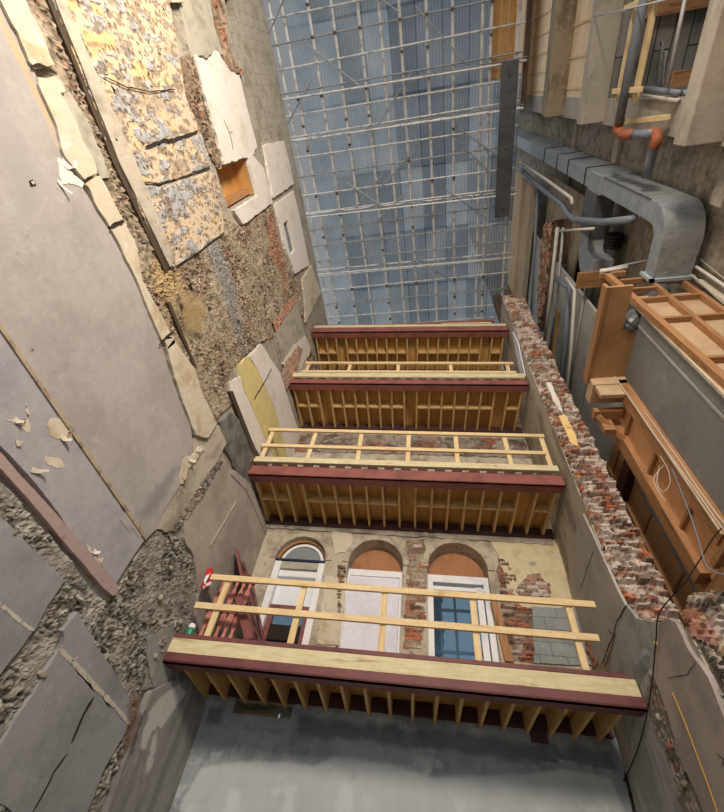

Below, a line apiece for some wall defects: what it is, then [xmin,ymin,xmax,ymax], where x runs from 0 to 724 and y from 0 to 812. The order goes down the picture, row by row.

spalling [26,0,304,421]
spalling [281,345,319,389]
peeling [7,403,31,446]
peeling [47,417,72,441]
peeling [31,456,65,473]
peeling [179,445,205,485]
spalling [496,219,724,695]
crack [0,601,34,631]
spalling [0,459,223,812]
crack [601,605,627,665]
crack [33,648,131,812]